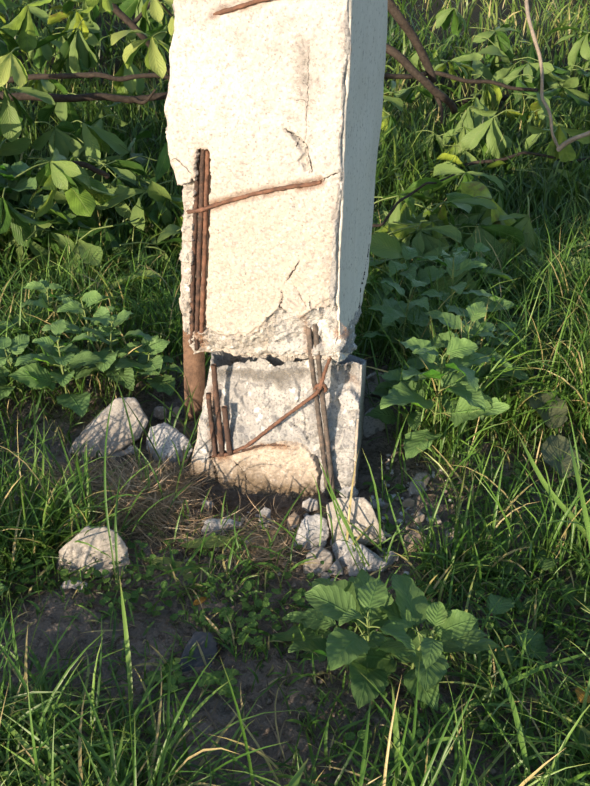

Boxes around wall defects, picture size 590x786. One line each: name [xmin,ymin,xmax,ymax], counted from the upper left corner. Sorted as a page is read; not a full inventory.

crack [286,53,338,182]
spalling [180,28,362,500]
crack [278,260,310,309]